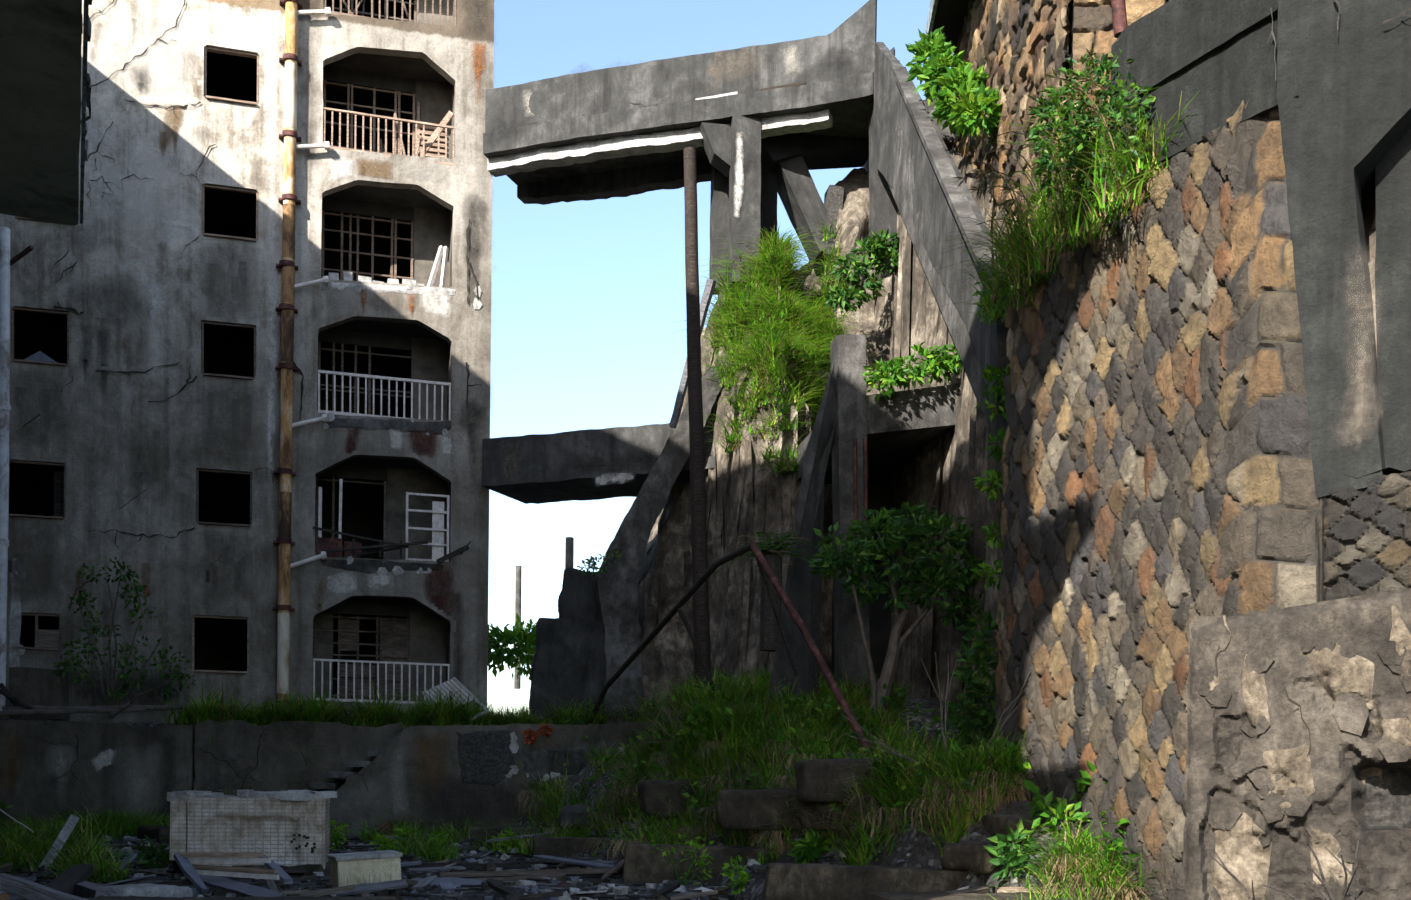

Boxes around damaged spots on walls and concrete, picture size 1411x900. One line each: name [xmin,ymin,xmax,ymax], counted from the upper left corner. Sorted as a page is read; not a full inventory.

crack [80,0,216,207]
crack [16,362,197,433]
crack [88,486,195,547]
rust [426,569,453,615]
spalling [1208,649,1362,900]
spalling [1301,606,1411,830]